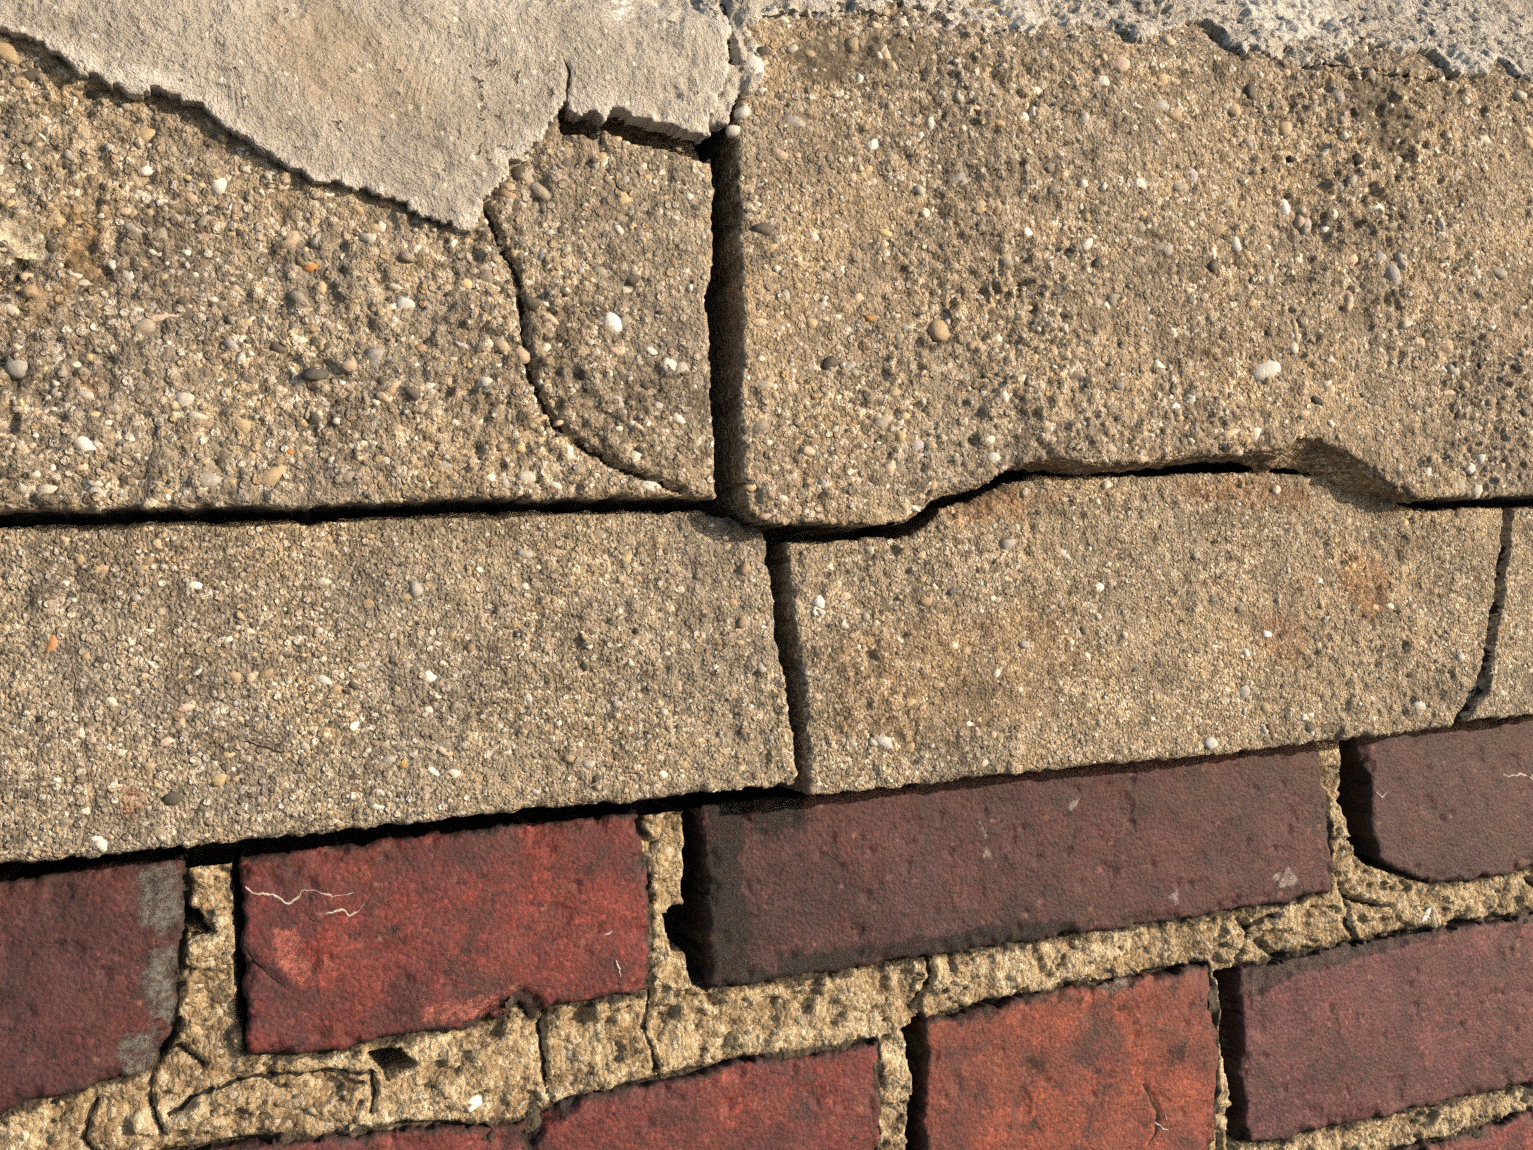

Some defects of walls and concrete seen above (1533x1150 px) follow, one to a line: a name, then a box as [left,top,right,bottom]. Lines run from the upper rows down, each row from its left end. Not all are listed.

peeling [0,0,732,233]
crack [596,134,623,192]
crack [483,209,677,492]
spalling [883,483,983,528]
spalling [1004,438,1414,504]
crack [1454,534,1507,722]
crack [73,663,94,847]
crack [245,741,298,766]
damp [117,863,182,1075]
crack [536,1009,549,1094]